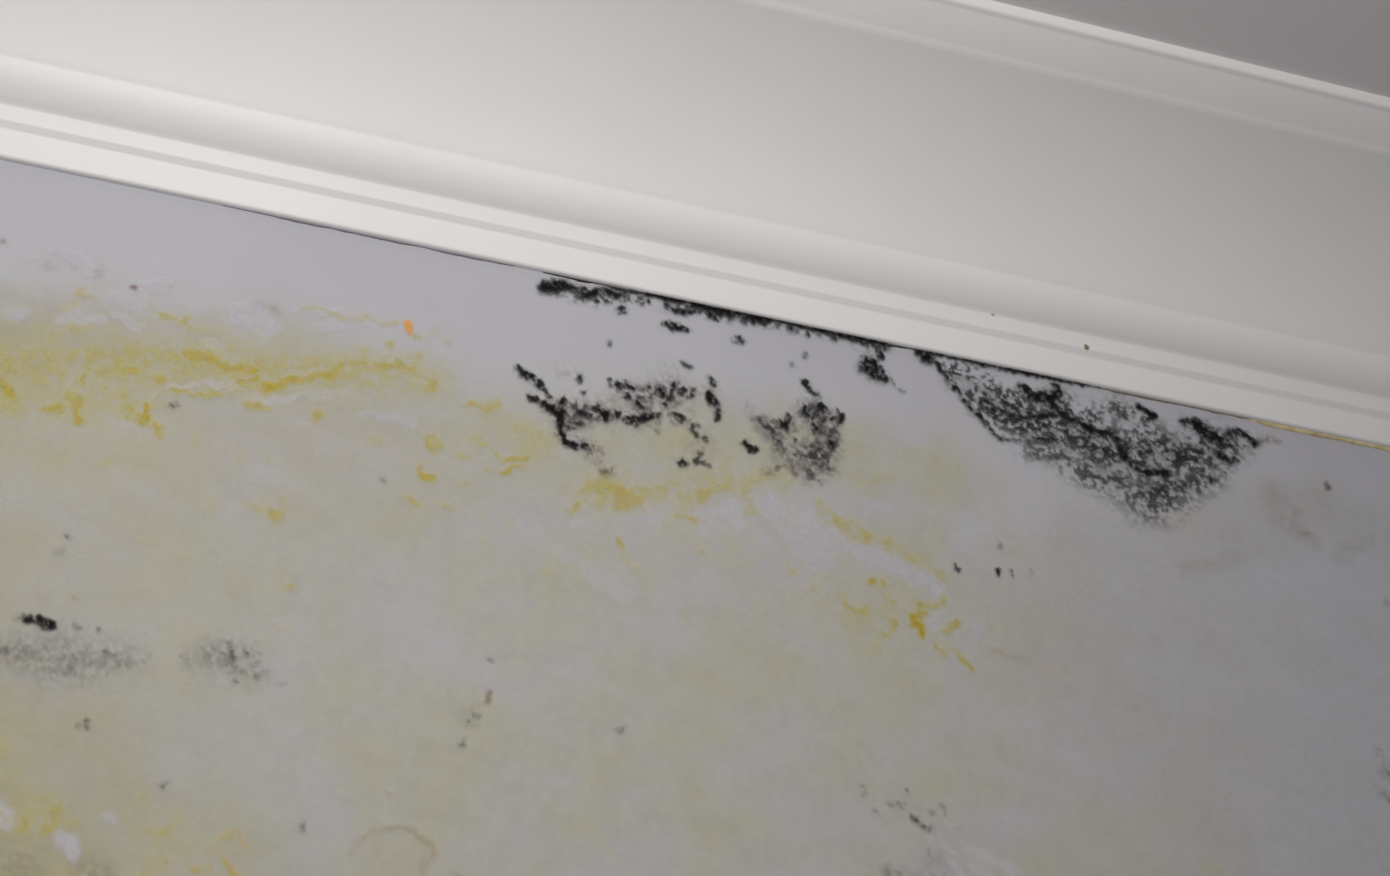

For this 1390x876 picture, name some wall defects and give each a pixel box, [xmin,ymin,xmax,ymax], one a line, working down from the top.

water stain [0,302,1268,876]
water stain [537,278,895,385]